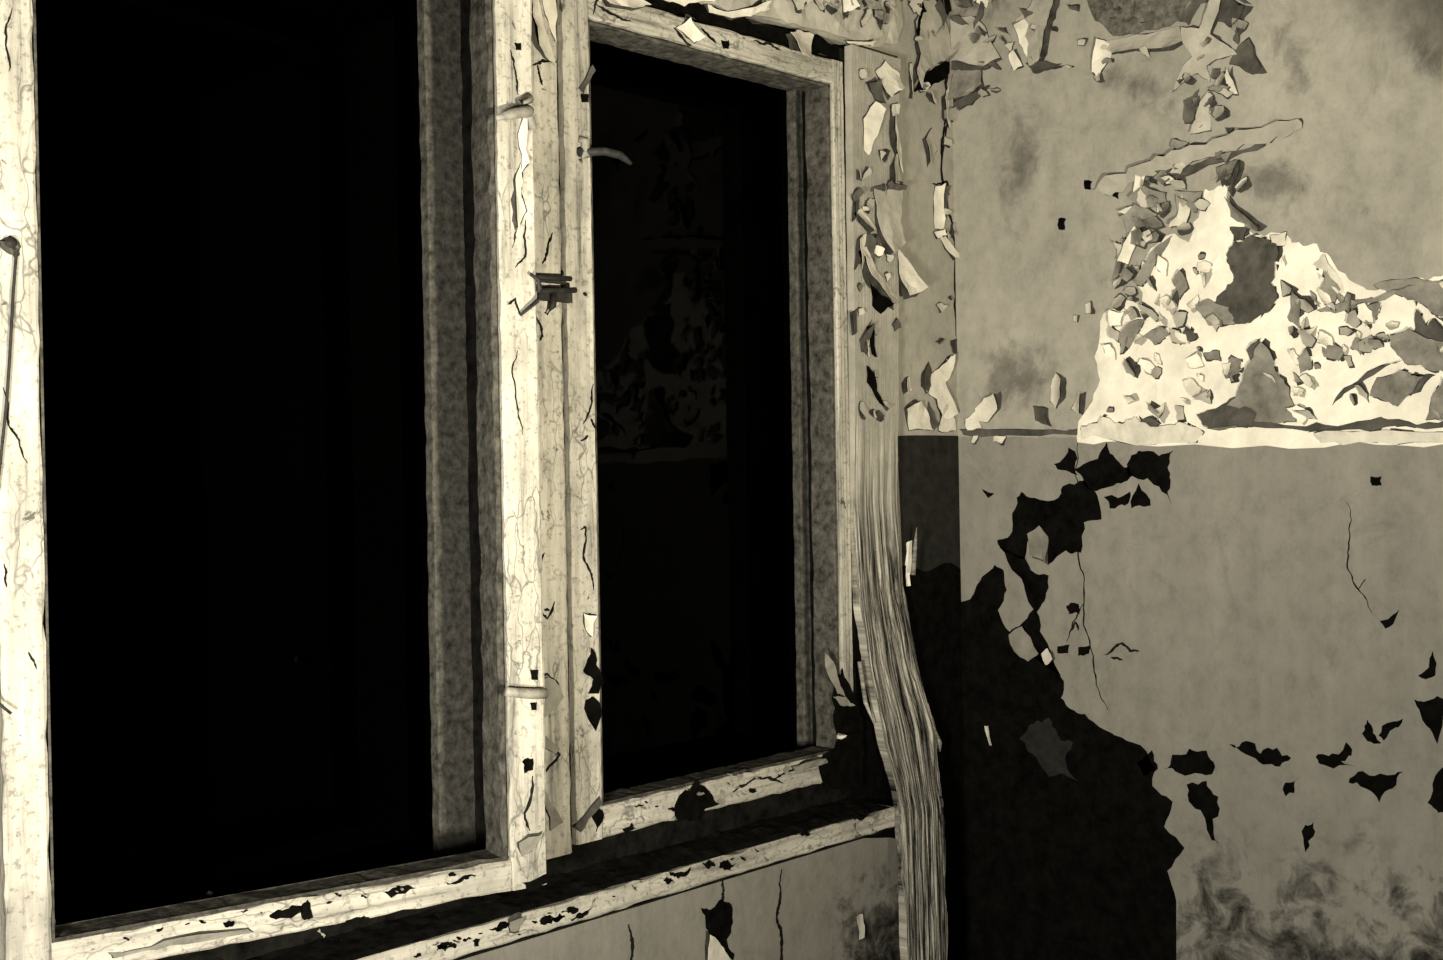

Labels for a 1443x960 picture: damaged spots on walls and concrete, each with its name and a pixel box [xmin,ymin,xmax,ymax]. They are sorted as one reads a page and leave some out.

peeling [510,0,558,94]
peeling [511,118,553,268]
peeling [593,0,1443,960]
peeling [530,670,564,718]
peeling [583,612,604,731]
peeling [517,736,604,857]
peeling [108,893,389,960]
peeling [385,885,415,898]
peeling [414,906,592,960]
crack [627,924,635,960]
crack [775,869,783,960]
crack [856,913,865,940]